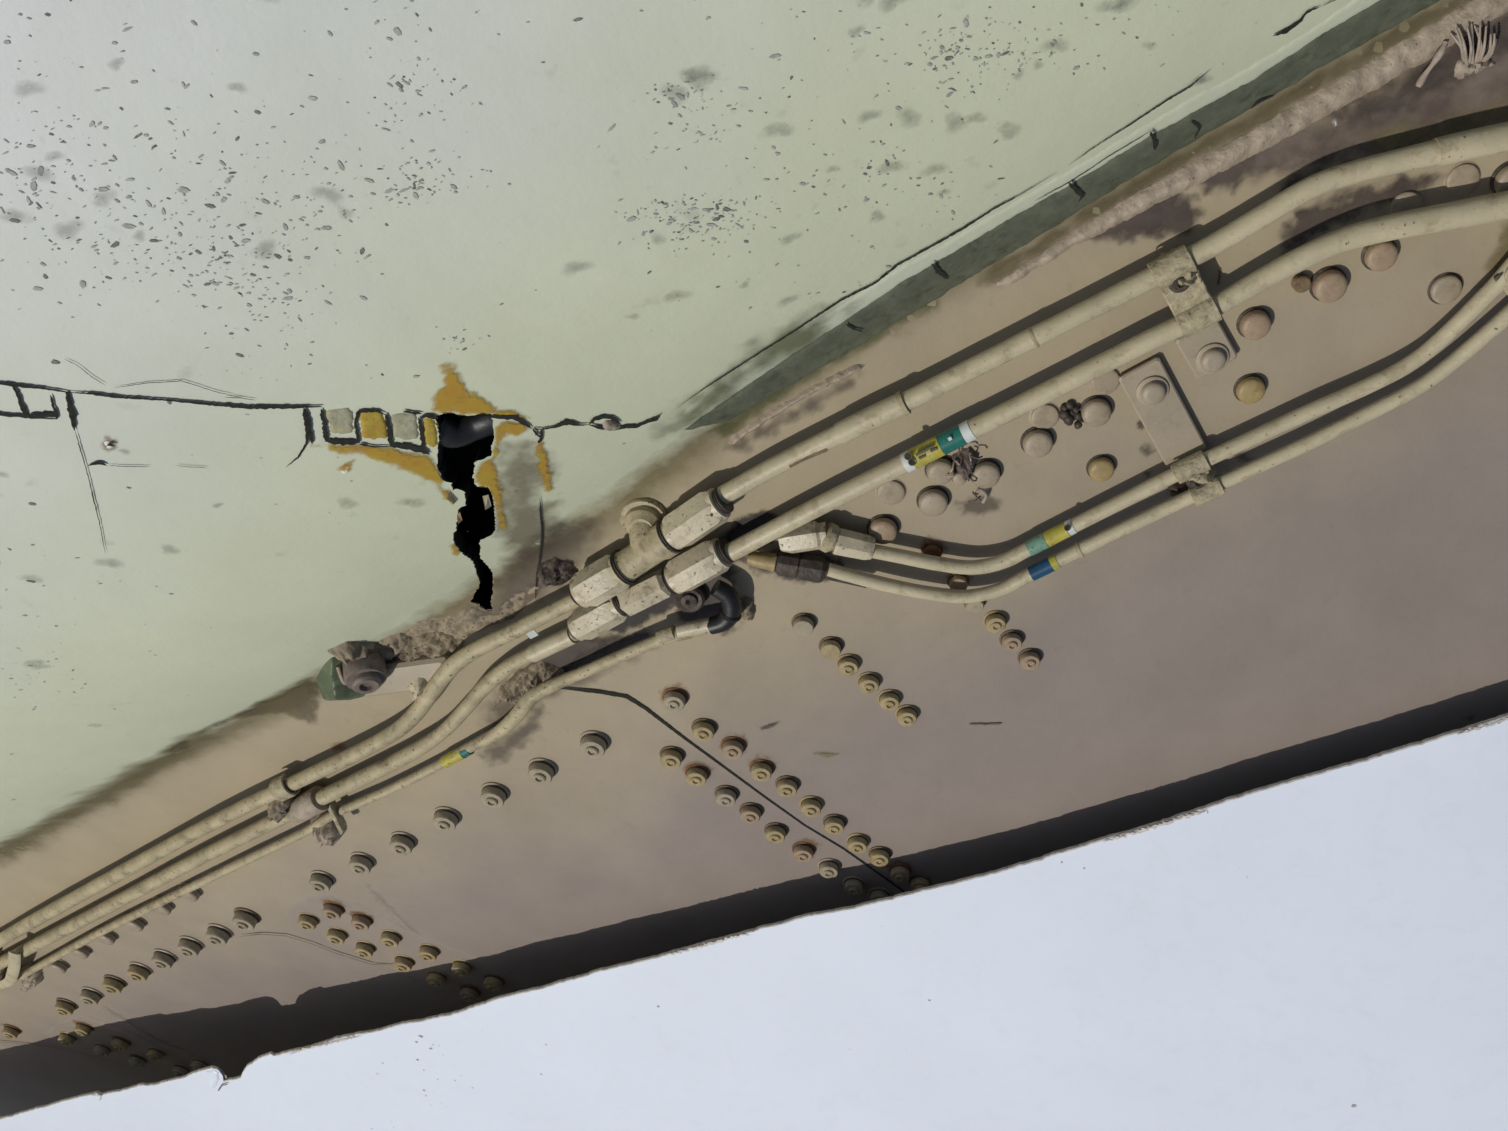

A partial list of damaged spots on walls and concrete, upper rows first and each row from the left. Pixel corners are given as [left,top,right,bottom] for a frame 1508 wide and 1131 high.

leakage [1203,16,1508,193]
crack [490,69,1211,443]
leakage [1092,194,1198,240]
leakage [1283,176,1432,251]
leakage [1491,228,1508,271]
crack [0,359,438,550]
spalling [328,365,559,599]